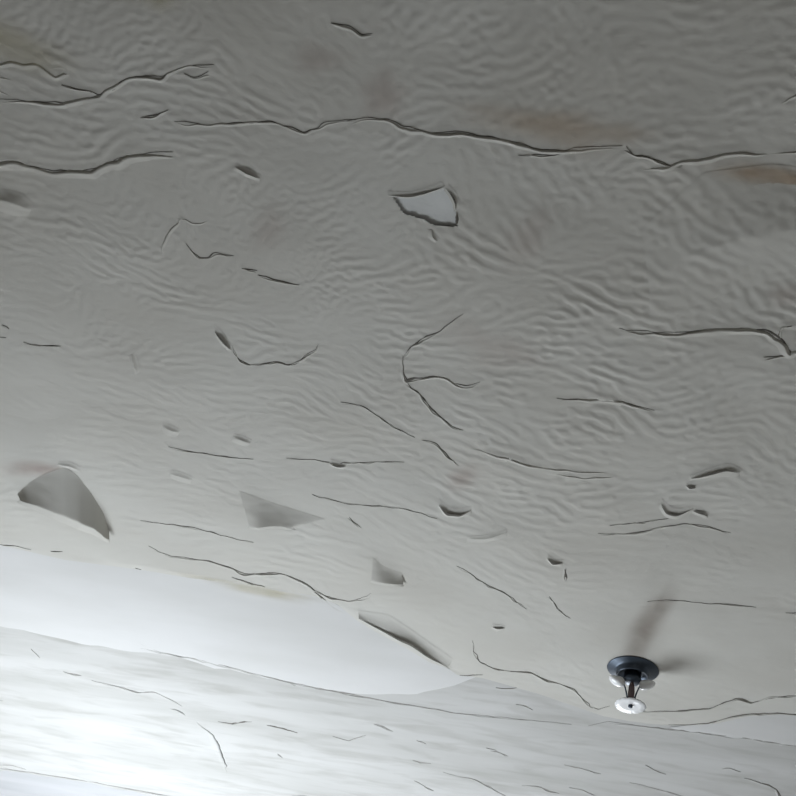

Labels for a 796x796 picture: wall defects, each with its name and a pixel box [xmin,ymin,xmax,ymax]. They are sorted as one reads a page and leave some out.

crack [0,61,214,109]
crack [141,110,796,172]
crack [0,152,174,179]
spalling [388,182,460,227]
crack [161,216,299,286]
crack [619,326,796,361]
crack [400,314,479,431]
crack [557,398,655,412]
crack [342,402,457,466]
crack [472,449,613,480]
crack [312,494,437,528]
crack [141,643,796,748]